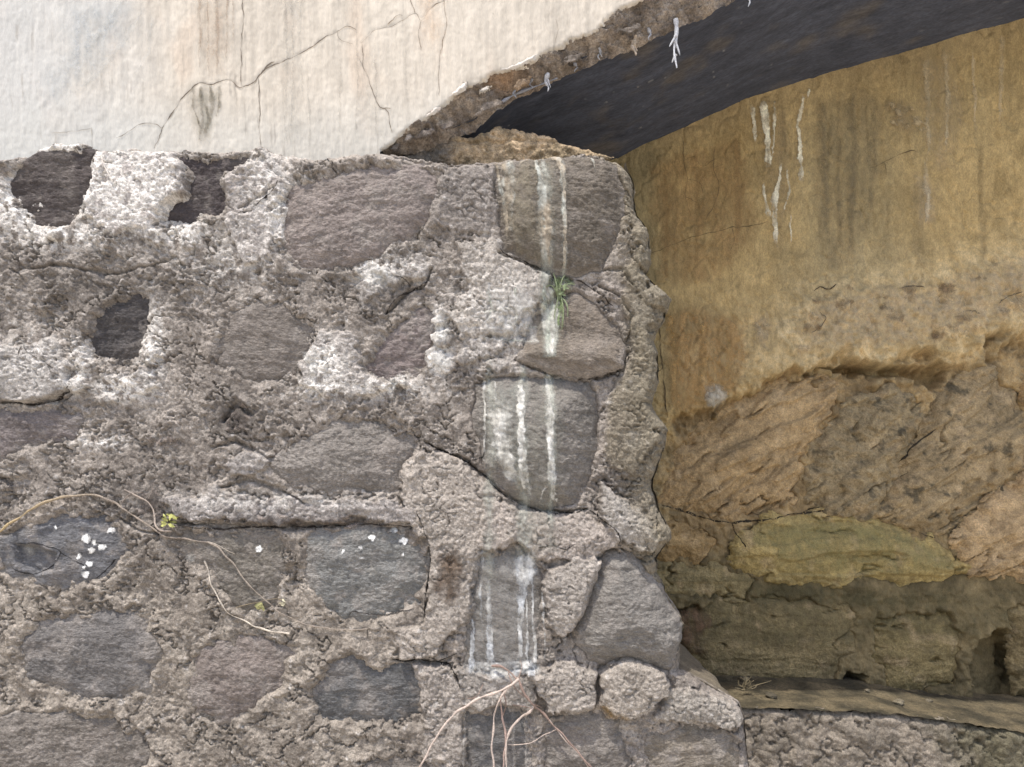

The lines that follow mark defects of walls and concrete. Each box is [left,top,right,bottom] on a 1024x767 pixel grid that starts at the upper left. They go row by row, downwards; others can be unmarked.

crack [119,0,447,148]
spalling [382,0,735,157]
damp [751,89,810,239]
damp [486,157,571,358]
damp [468,367,557,678]
crack [662,505,823,547]